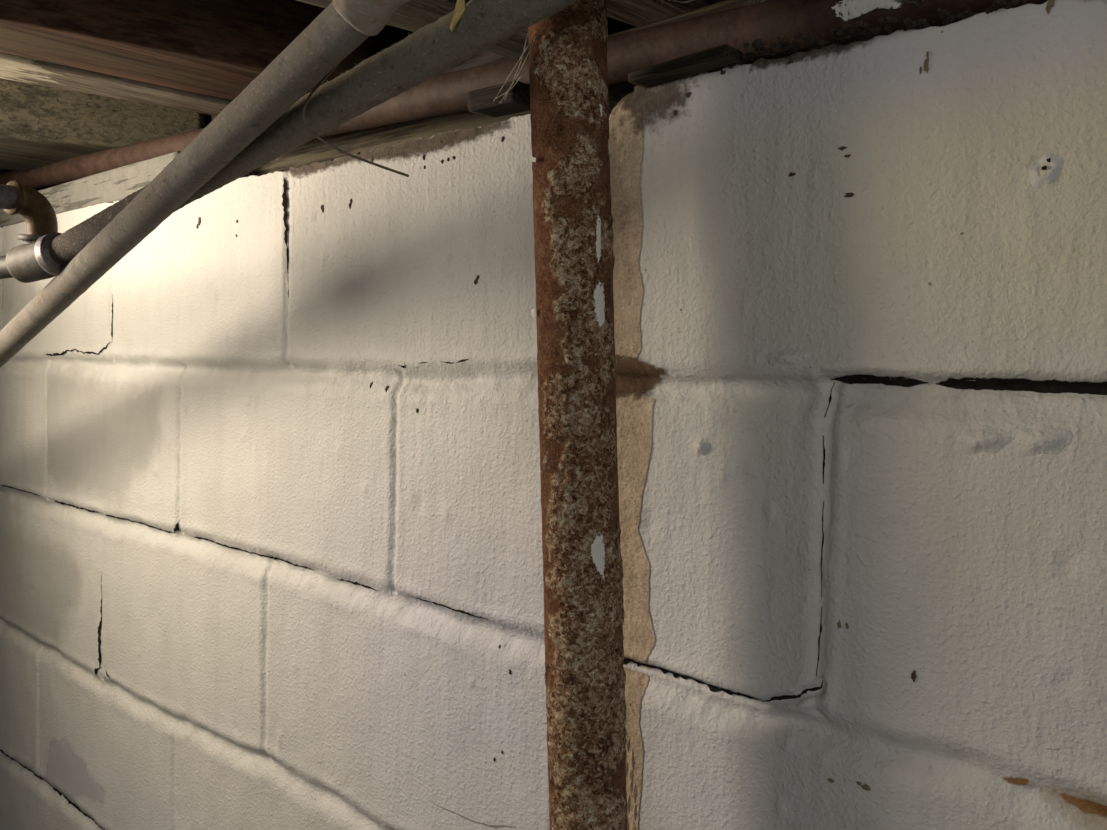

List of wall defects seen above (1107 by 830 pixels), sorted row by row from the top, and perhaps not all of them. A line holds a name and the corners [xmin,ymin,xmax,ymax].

crack [281,178,289,298]
crack [46,299,113,356]
crack [1,485,313,570]
crack [623,374,1107,702]
crack [94,579,109,677]
crack [337,579,377,591]
crack [410,595,488,620]
crack [0,749,105,830]